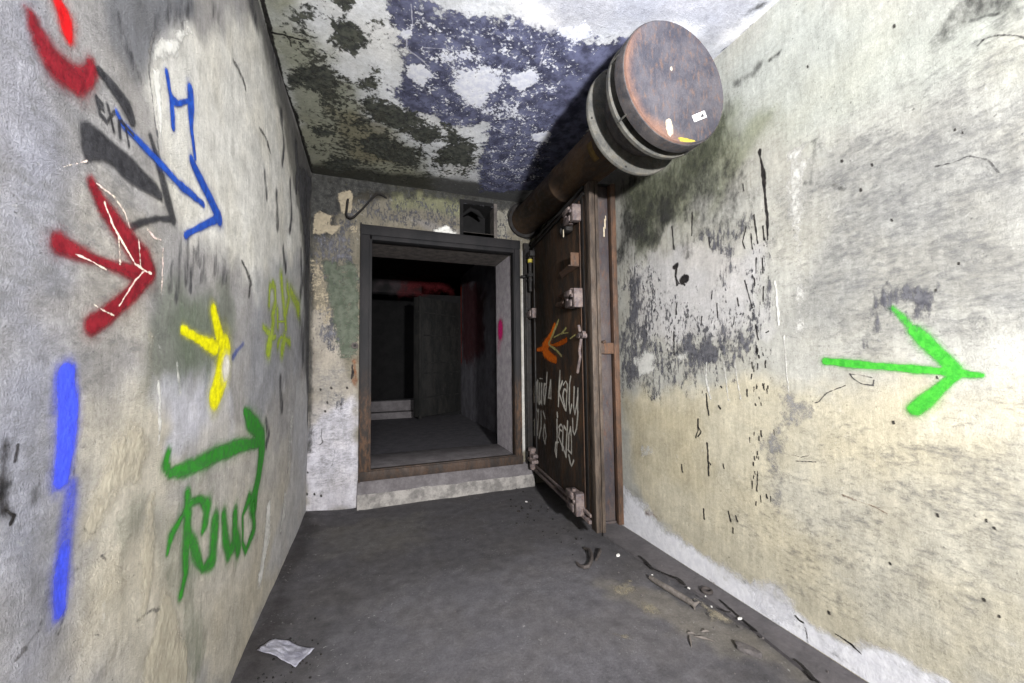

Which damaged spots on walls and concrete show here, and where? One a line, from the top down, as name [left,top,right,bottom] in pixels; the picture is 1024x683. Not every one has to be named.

peeling [313,190,357,235]
leakage [251,0,518,393]
peeling [788,149,806,229]
peeling [310,260,334,323]
leakage [617,149,772,406]
peeling [634,350,656,376]
peeling [774,280,789,391]
leakage [695,393,725,476]
leakage [623,486,951,683]